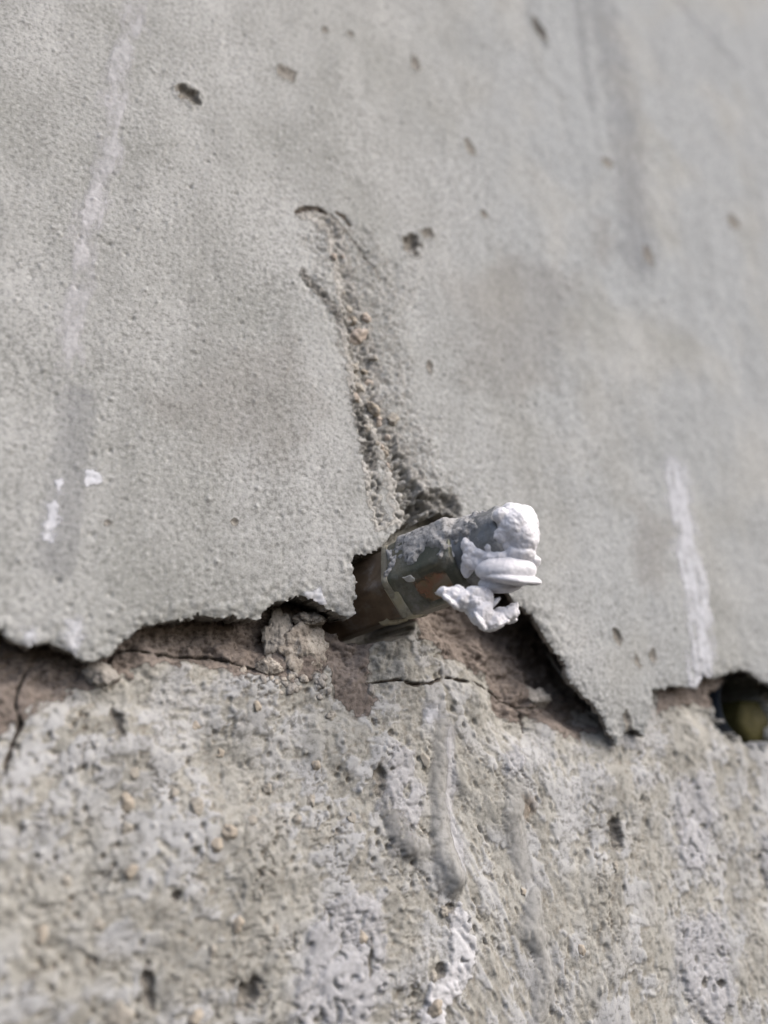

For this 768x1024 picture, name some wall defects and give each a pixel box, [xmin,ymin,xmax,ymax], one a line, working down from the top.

crack [294,206,381,280]
crack [4,675,25,777]
crack [72,650,255,670]
spalling [0,595,378,736]
crack [368,677,539,733]
spalling [401,593,616,746]
spalling [623,710,645,737]
spalling [652,669,768,714]
hole [373,757,386,796]
hole [606,813,625,849]
hole [139,961,155,1010]
hole [235,976,266,1011]